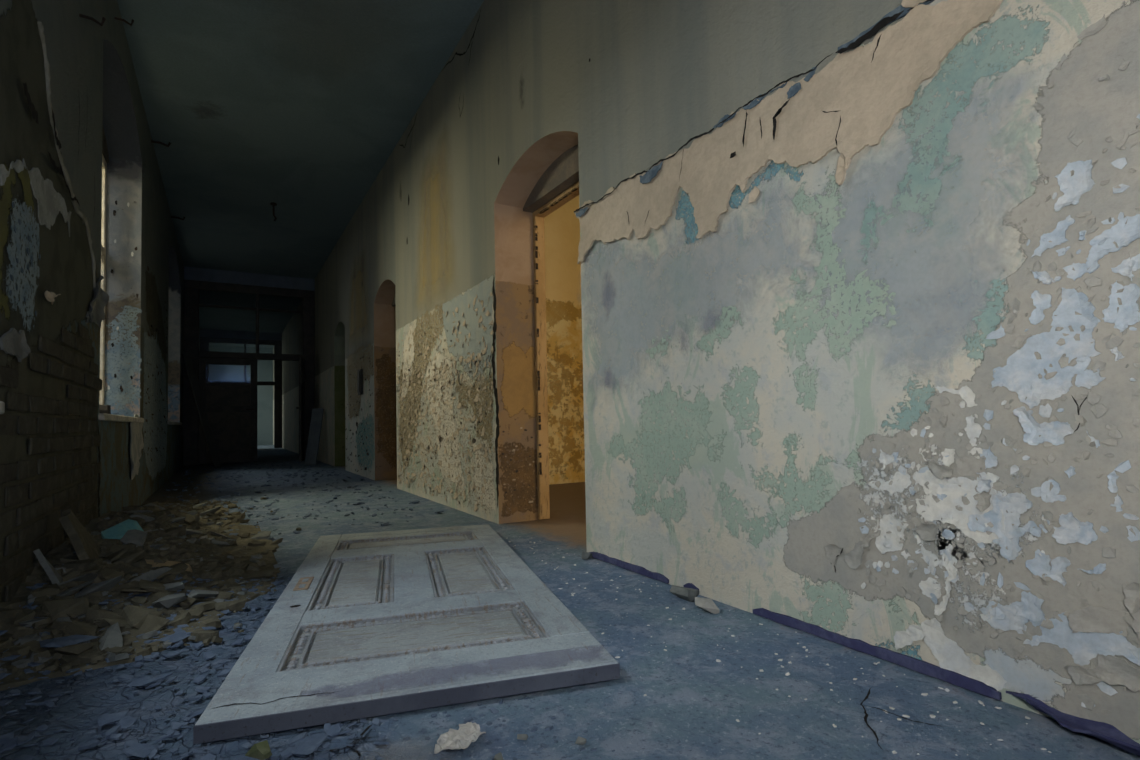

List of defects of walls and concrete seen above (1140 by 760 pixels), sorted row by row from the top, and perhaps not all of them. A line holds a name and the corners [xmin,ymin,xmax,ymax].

flaking render [0,0,168,602]
peeling [345,275,538,517]
peeling [546,298,582,329]
peeling [709,0,1140,740]
crack [860,689,945,750]